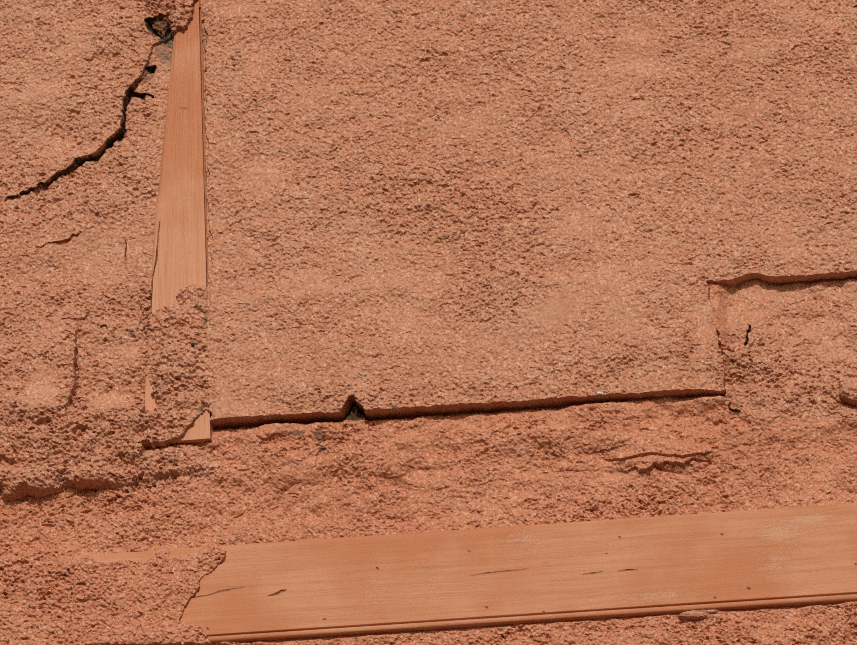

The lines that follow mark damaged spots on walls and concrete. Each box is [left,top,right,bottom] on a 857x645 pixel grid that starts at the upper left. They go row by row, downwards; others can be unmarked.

peeling [144,0,197,39]
crack [5,72,154,202]